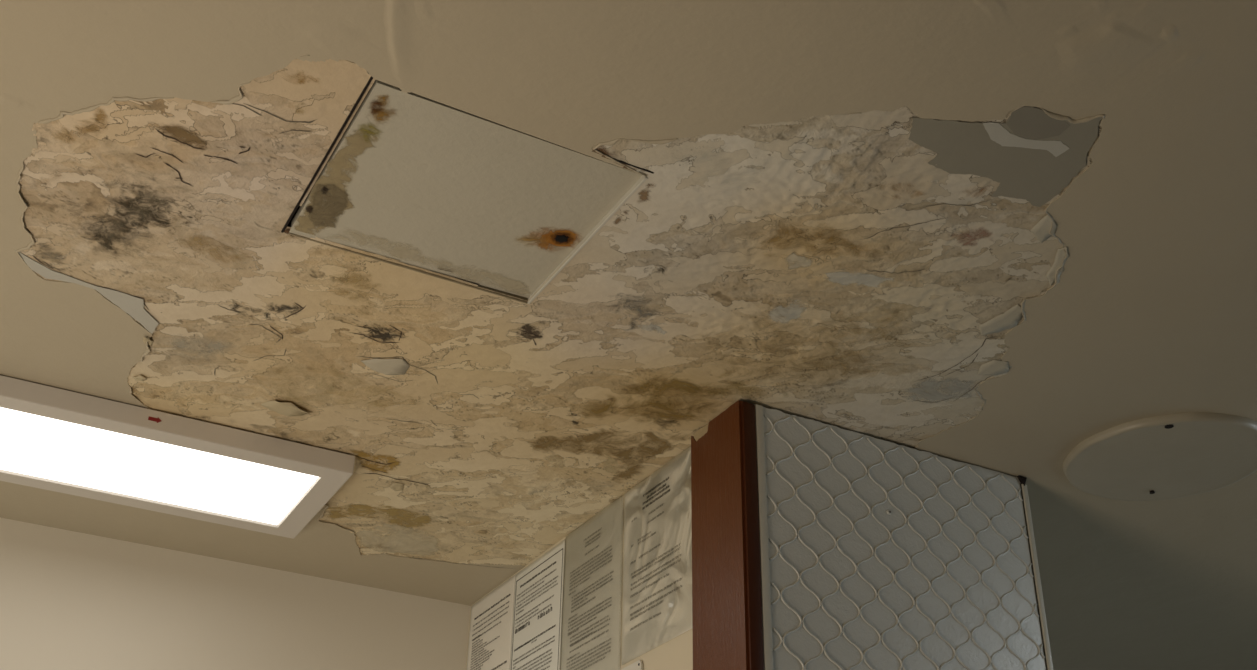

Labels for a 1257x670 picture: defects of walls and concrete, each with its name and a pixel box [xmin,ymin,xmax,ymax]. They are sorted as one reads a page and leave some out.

damp [94,185,170,250]
rust [519,230,577,250]
damp [361,325,404,341]
peeling [15,55,1105,566]
damp [533,379,715,478]